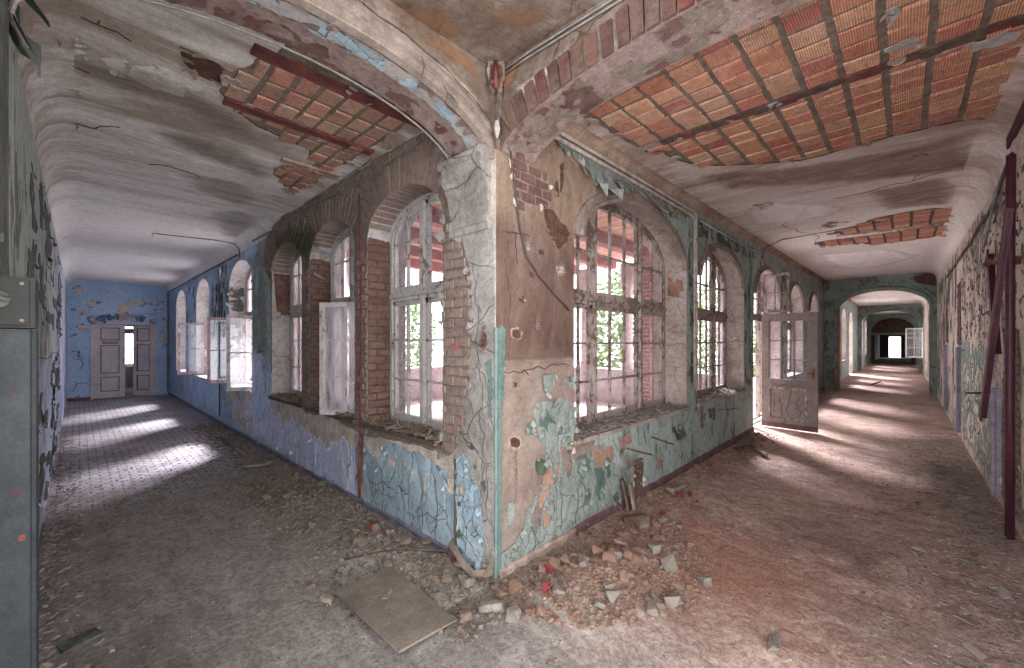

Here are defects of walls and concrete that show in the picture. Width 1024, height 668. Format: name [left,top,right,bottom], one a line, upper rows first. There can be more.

peeling [39,353,61,510]
peeling [27,162,101,338]
flaking render [166,0,662,570]
crack [355,231,572,561]
peeling [487,0,1024,256]
flaking render [914,191,1024,525]